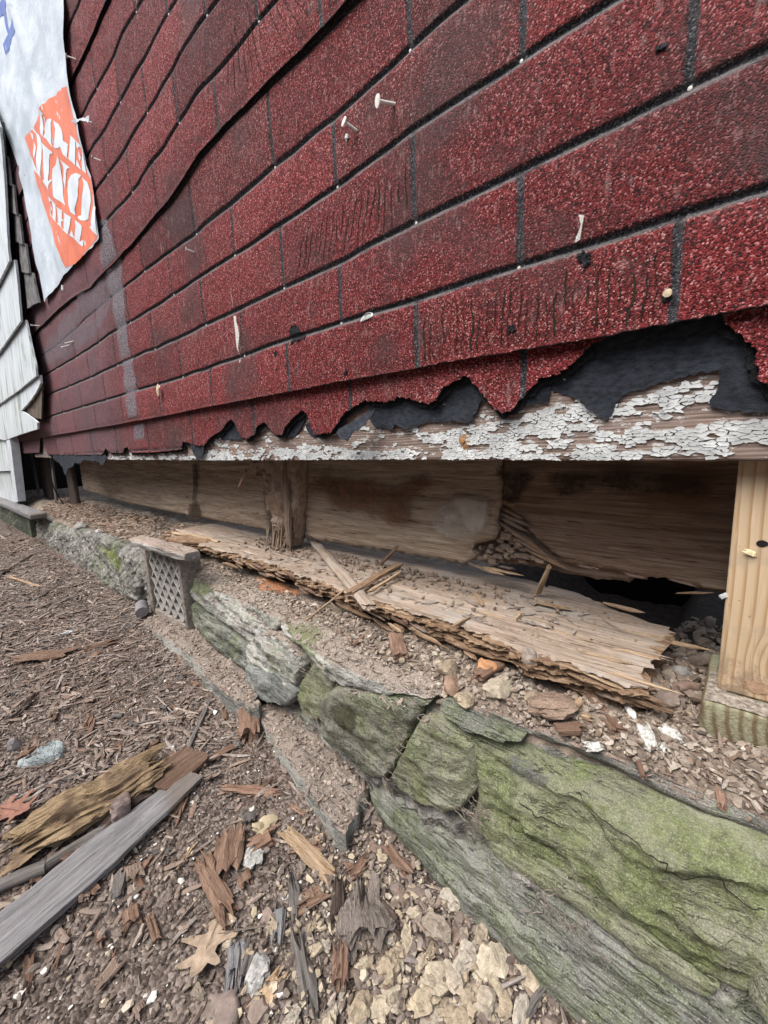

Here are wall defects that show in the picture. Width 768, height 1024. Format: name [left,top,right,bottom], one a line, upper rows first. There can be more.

peeling [106,380,768,461]
peeling [476,529,547,564]